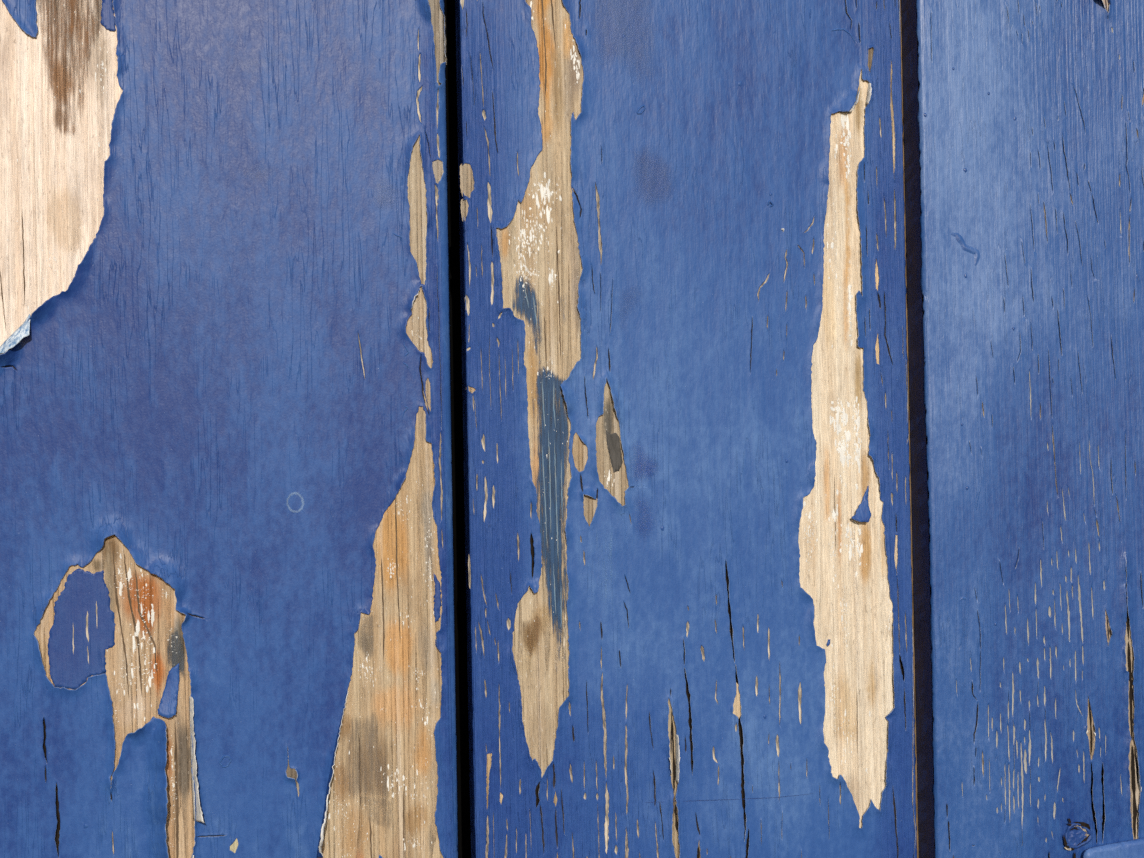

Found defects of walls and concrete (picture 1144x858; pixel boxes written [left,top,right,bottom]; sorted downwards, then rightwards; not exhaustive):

peeling [0,0,123,354]
leakage [40,0,114,133]
peeling [316,135,443,858]
peeling [428,0,447,85]
crack [416,0,519,546]
peeling [496,0,629,777]
crack [573,149,613,416]
peeling [798,47,898,828]
crack [946,92,1144,858]
peeling [34,535,205,858]
crack [468,503,664,858]
crack [670,562,841,858]